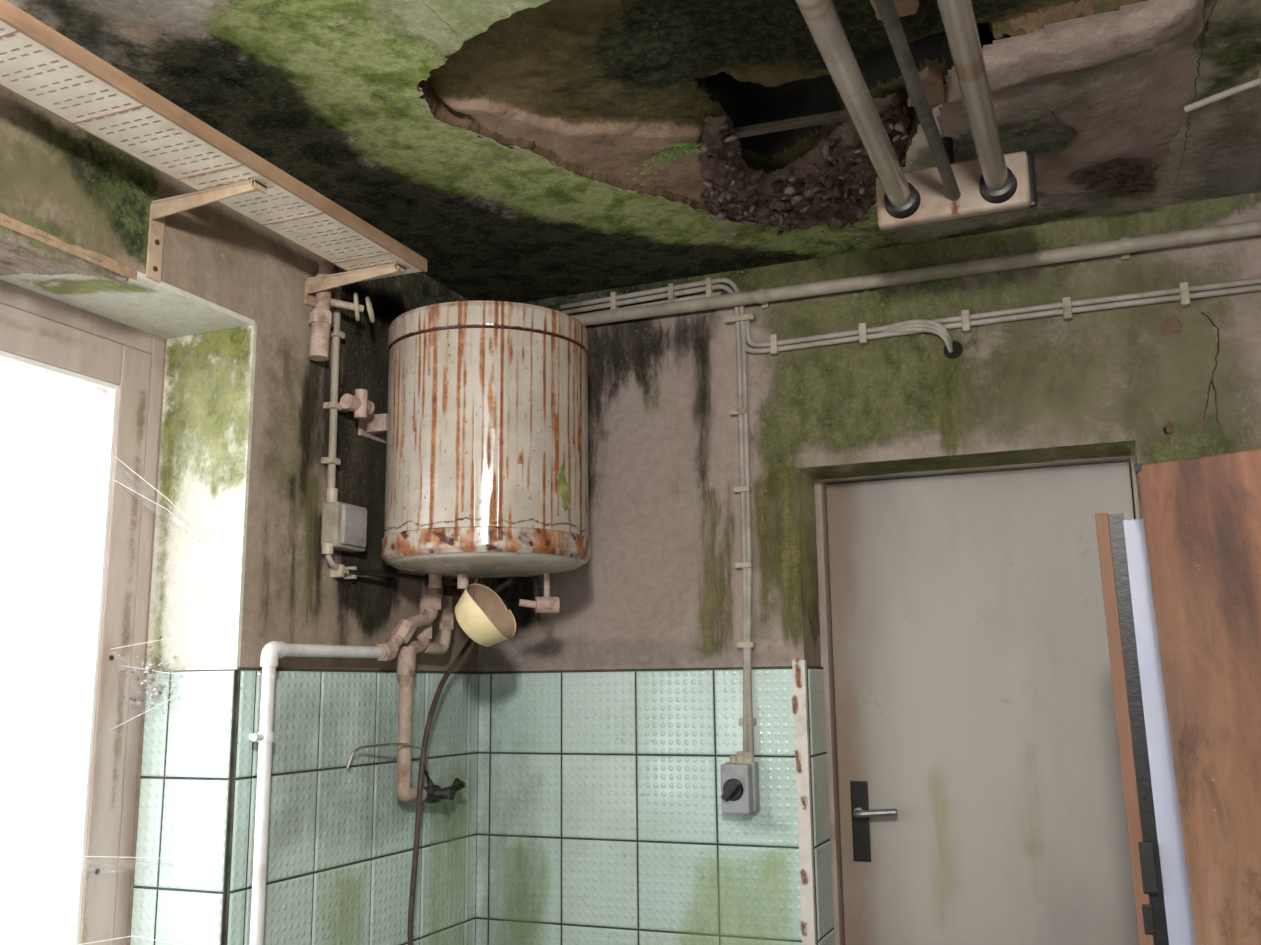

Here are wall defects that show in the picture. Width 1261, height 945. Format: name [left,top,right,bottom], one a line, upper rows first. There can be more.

water stain [0,111,157,263]
flaking render [418,0,878,235]
flaking render [832,0,954,168]
flaking render [972,0,1149,40]
water stain [869,0,1261,250]
water stain [24,0,813,666]
water stain [777,262,1253,456]